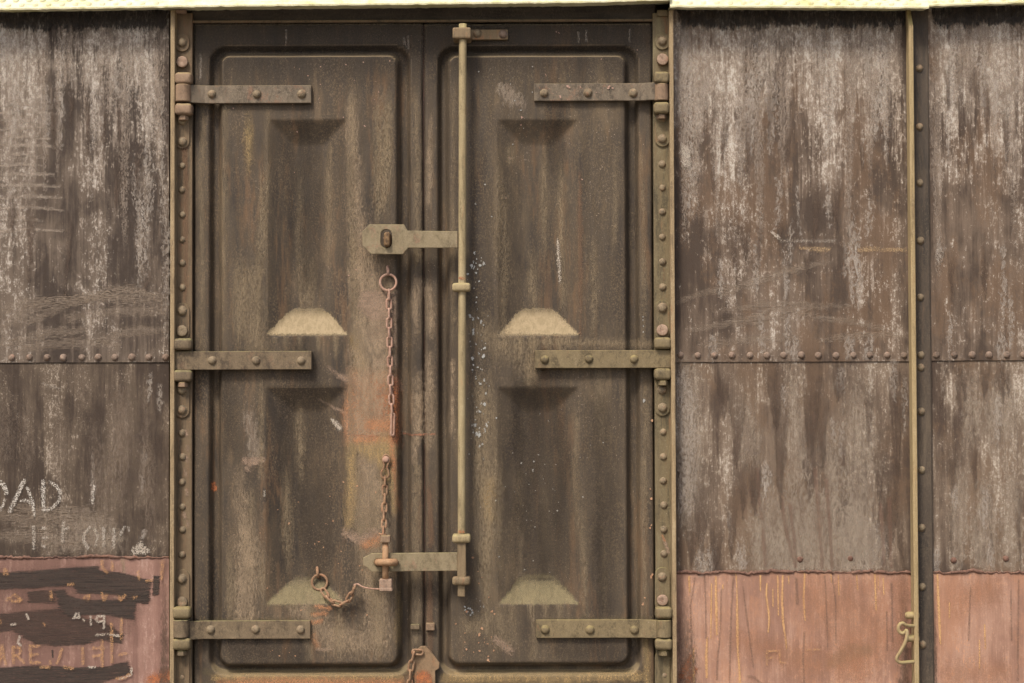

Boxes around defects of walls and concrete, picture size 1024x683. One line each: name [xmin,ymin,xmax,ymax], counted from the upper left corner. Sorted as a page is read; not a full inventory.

peeling [679,145,692,167]
rust [343,370,434,548]
damp [733,425,743,466]
rust [677,574,741,683]
rust [759,575,789,648]
rust [937,574,950,644]